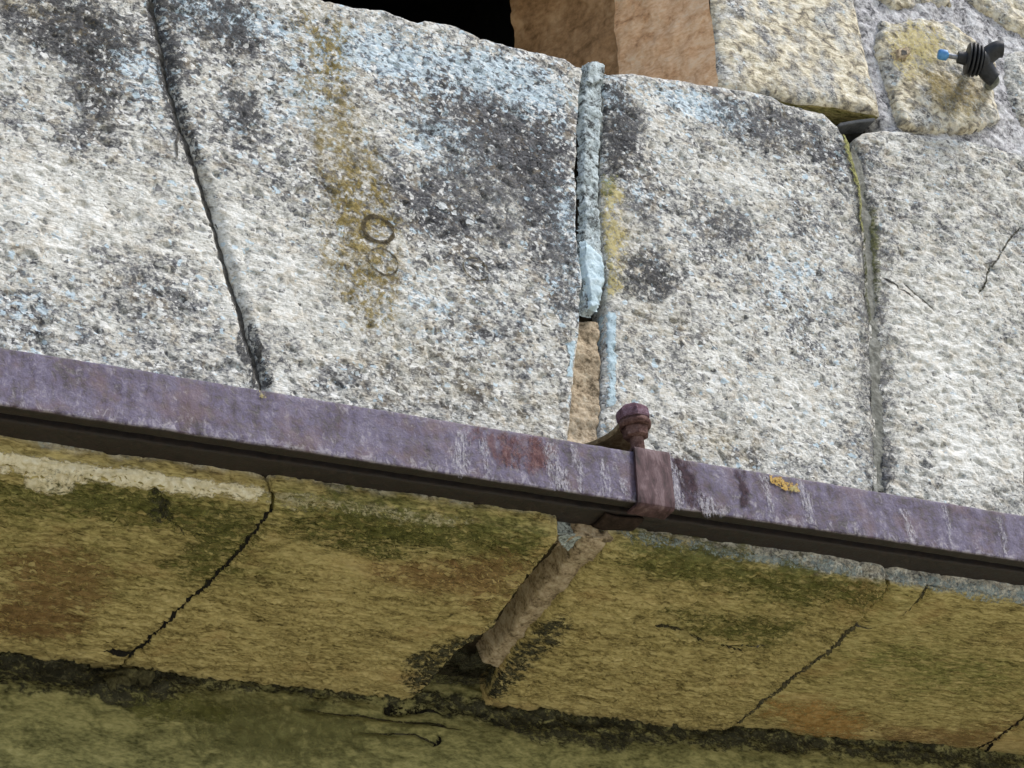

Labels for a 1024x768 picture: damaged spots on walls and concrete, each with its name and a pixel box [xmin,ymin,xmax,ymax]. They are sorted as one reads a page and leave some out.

crack [979,228,1020,293]
crack [147,487,184,535]
crack [103,509,273,658]
crack [905,585,937,613]
water stain [0,614,1024,768]
crack [737,622,872,724]